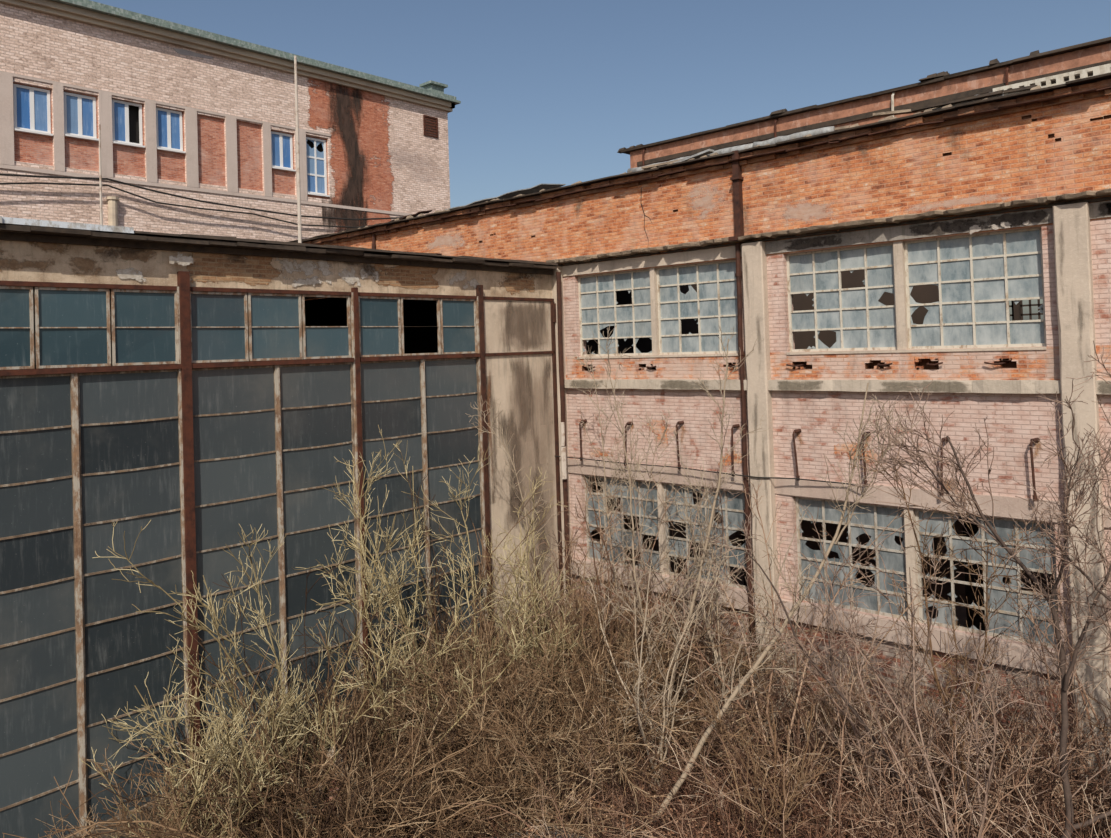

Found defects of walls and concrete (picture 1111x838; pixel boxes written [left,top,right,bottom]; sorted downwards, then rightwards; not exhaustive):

spalling [0,242,479,290]
water stain [506,303,544,348]
spalling [786,361,813,369]
spalling [864,360,892,369]
spalling [914,358,943,370]
spalling [984,358,1017,368]
water stain [491,363,550,559]